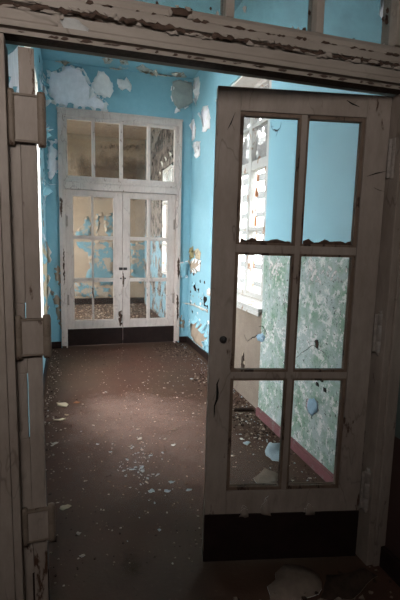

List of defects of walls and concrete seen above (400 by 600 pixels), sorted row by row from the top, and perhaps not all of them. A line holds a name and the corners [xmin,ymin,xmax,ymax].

peeling [6,44,20,93]
peeling [39,57,132,112]
peeling [136,64,211,158]
peeling [0,0,400,70]
peeling [40,123,58,205]
peeling [42,220,65,330]
peeling [176,246,210,350]
crack [212,380,220,415]